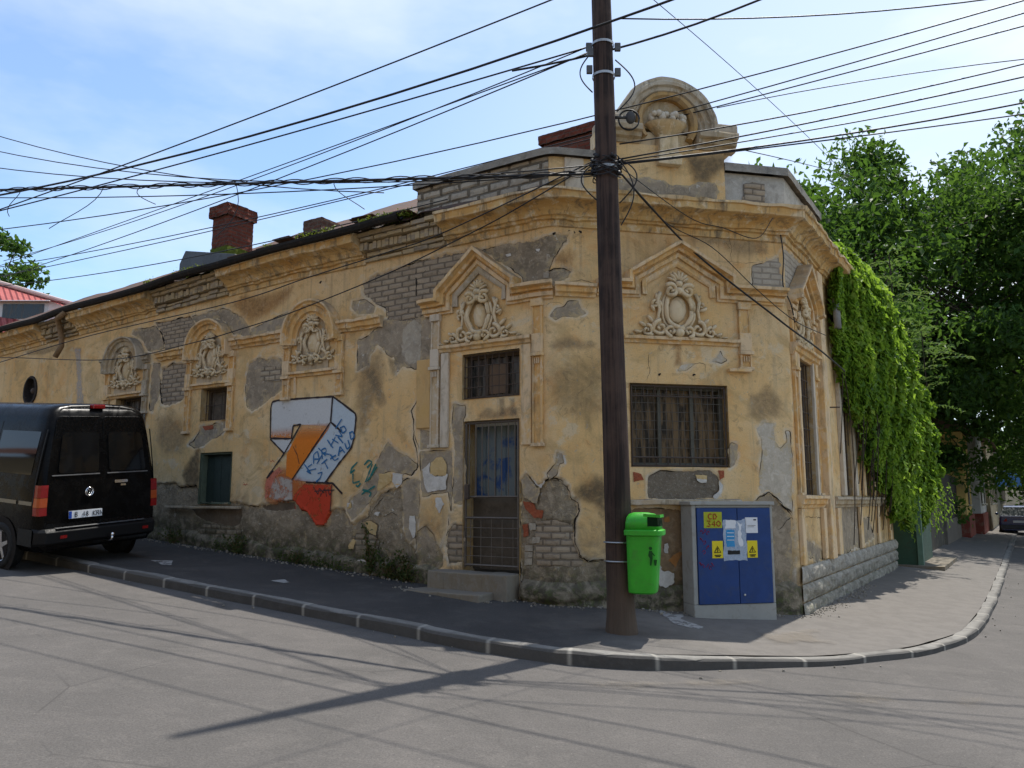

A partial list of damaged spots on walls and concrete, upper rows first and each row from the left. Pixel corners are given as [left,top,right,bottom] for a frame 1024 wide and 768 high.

peeling [482,233,571,284]
peeling [751,250,803,294]
peeling [352,299,431,372]
peeling [550,300,586,320]
peeling [245,358,282,411]
spalling [153,404,467,569]
spalling [520,452,606,584]
peeling [631,443,738,588]
peeling [756,422,793,585]